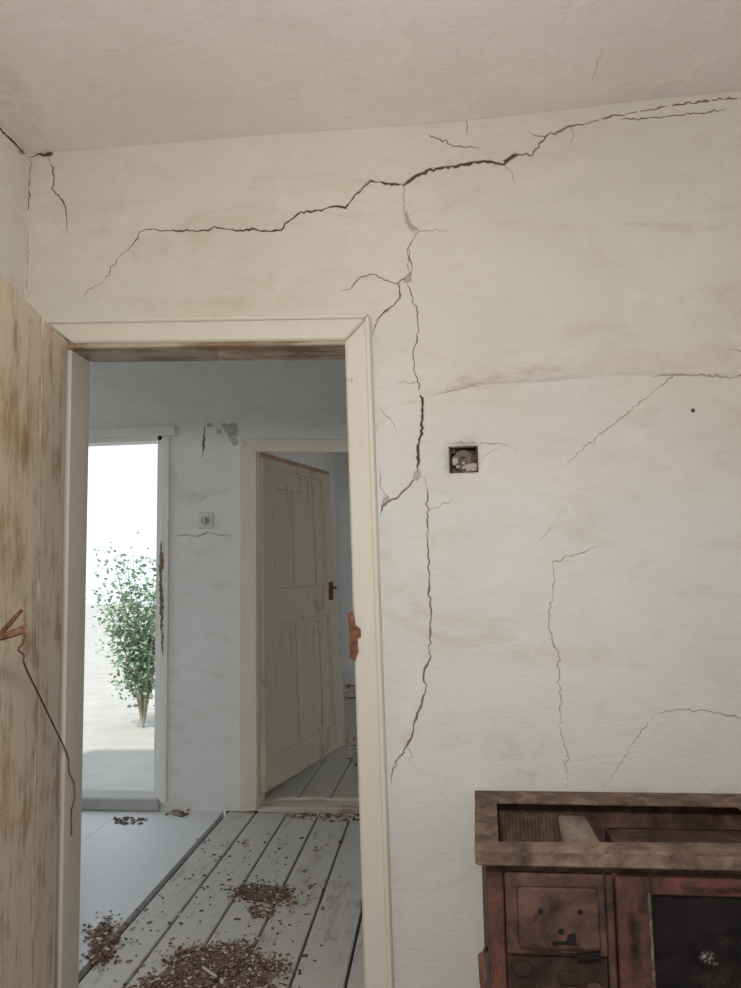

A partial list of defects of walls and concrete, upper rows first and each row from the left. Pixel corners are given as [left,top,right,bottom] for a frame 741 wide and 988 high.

crack [0,128,68,295]
crack [85,97,741,786]